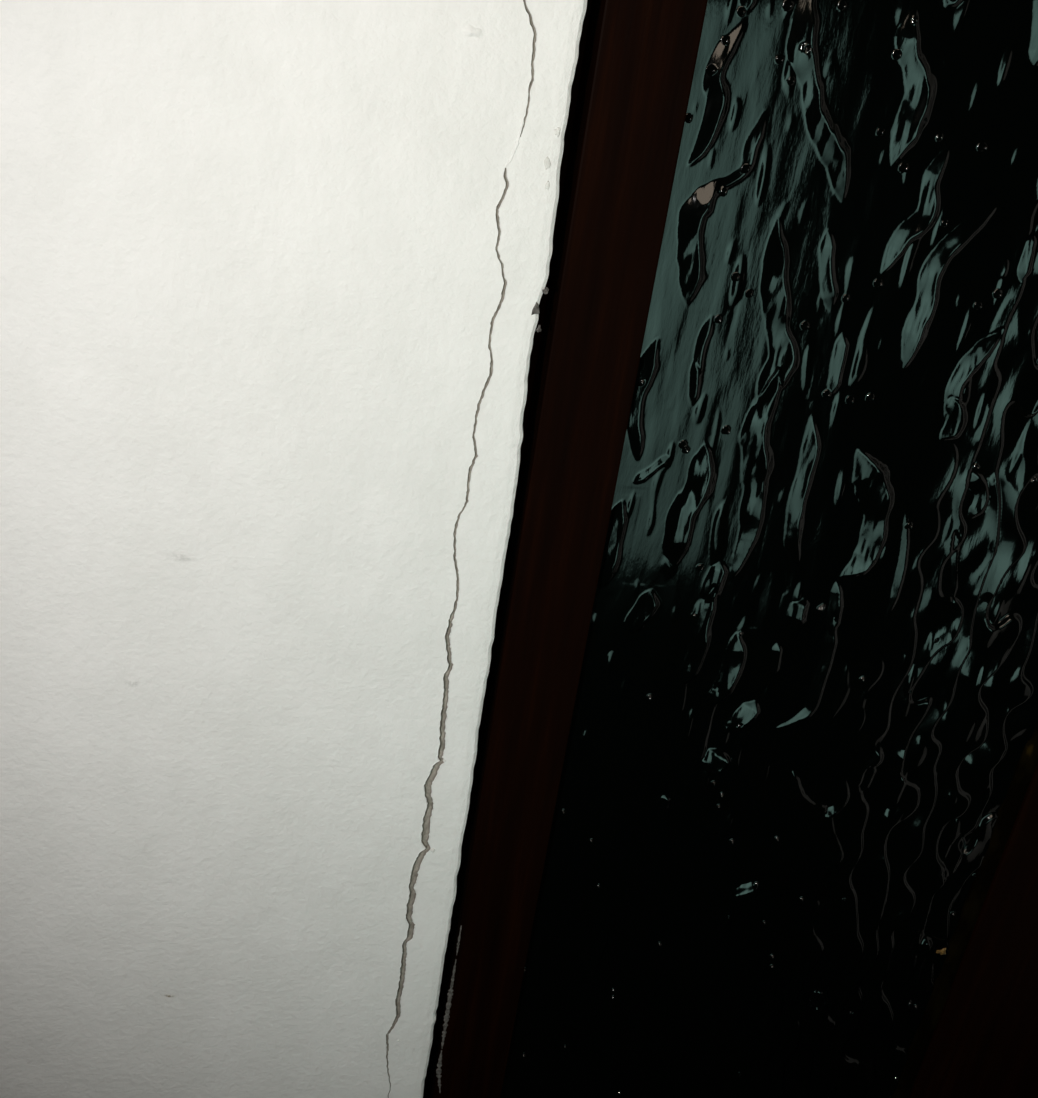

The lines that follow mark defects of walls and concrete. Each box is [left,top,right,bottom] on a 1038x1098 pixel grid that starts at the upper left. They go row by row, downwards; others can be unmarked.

crack [385,0,537,1098]